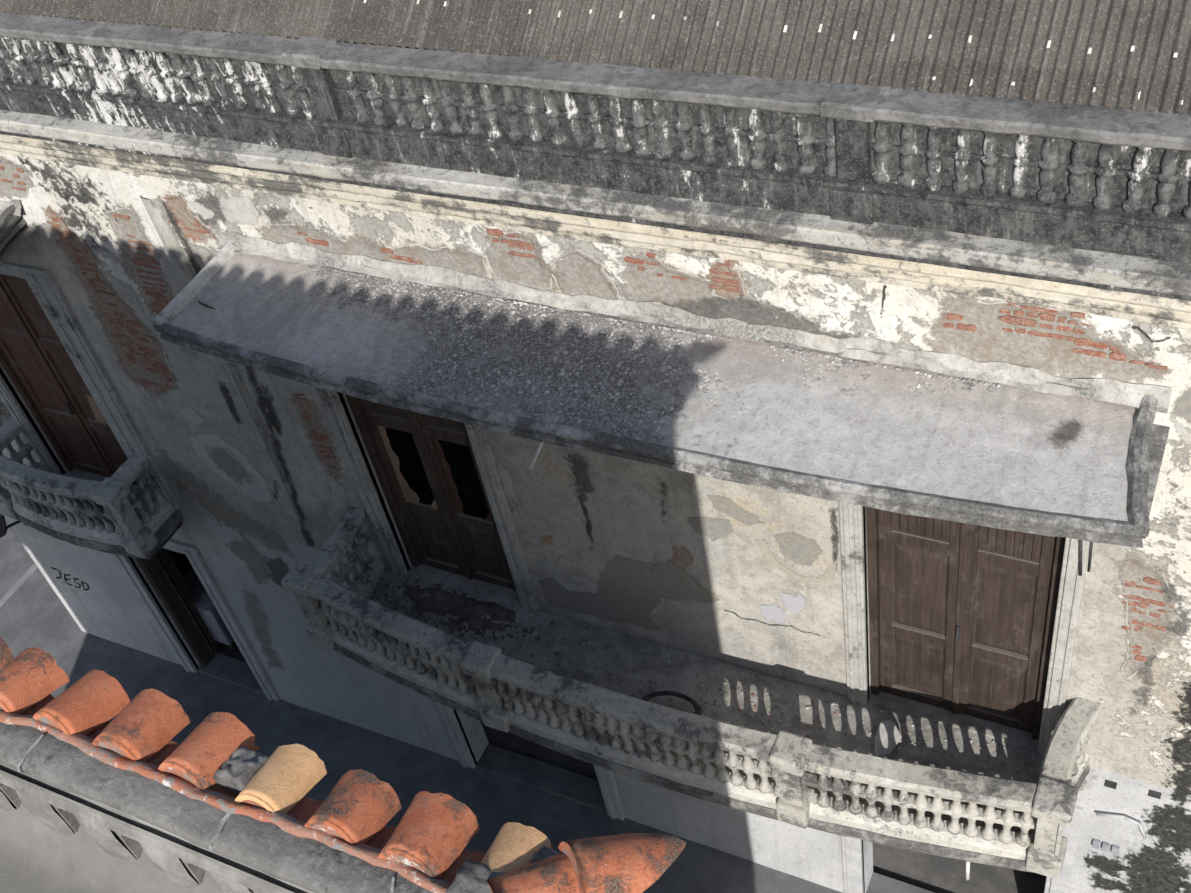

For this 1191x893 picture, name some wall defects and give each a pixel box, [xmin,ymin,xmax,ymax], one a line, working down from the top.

flaking render [41,204,177,397]
leakage [160,201,201,274]
flaking render [158,194,751,309]
spalling [329,269,745,450]
flaking render [922,296,1172,384]
leakage [245,366,314,547]
leakage [562,454,594,550]
peeling [775,532,823,566]
flaking render [1111,554,1181,682]
leakage [1163,580,1191,635]
leakage [1130,657,1154,715]
leakage [1083,682,1191,893]